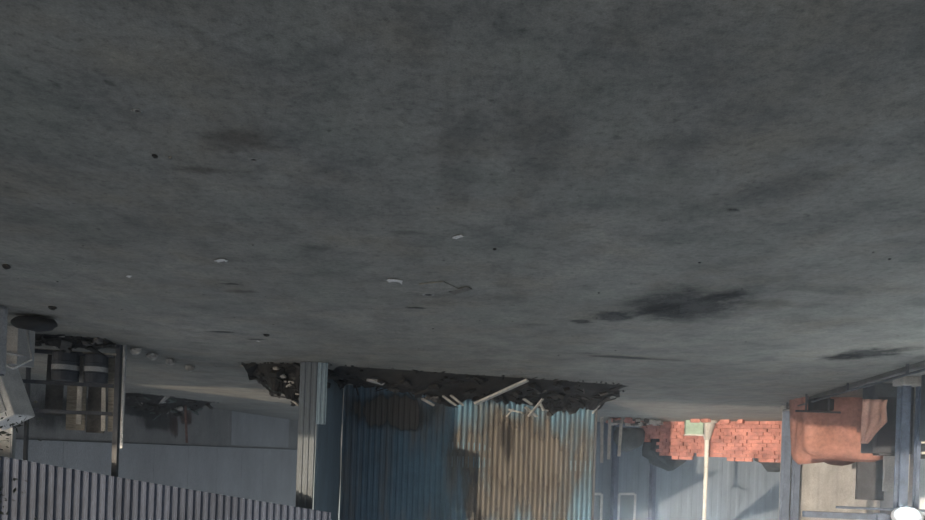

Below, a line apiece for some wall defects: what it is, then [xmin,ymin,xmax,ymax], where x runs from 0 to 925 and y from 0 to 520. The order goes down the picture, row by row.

leakage [632,290,743,319]
leakage [829,348,900,360]